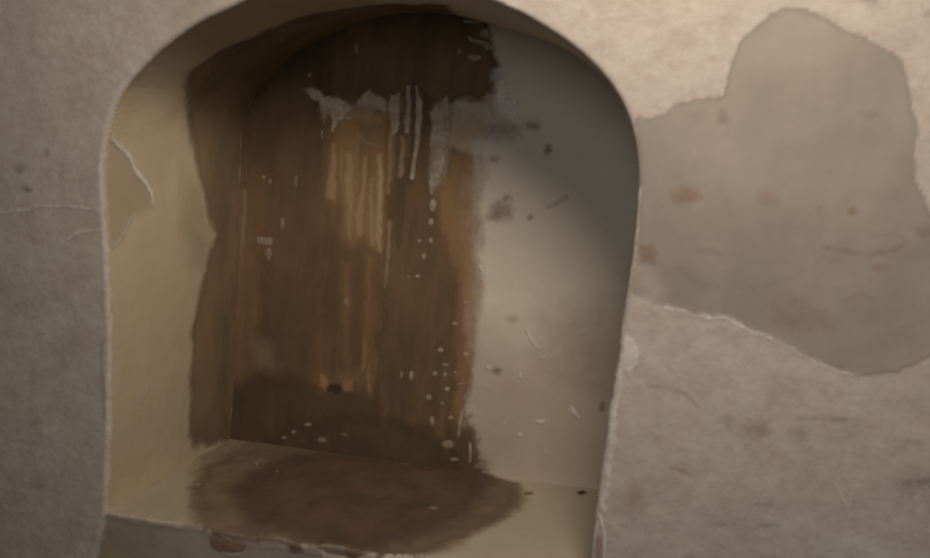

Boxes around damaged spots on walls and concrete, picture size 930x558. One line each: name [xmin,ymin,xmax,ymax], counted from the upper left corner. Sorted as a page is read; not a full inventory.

crack [110,135,154,206]
damp [188,4,518,558]
flaking render [634,8,930,376]
flaking render [93,469,414,558]
spalling [593,314,639,558]